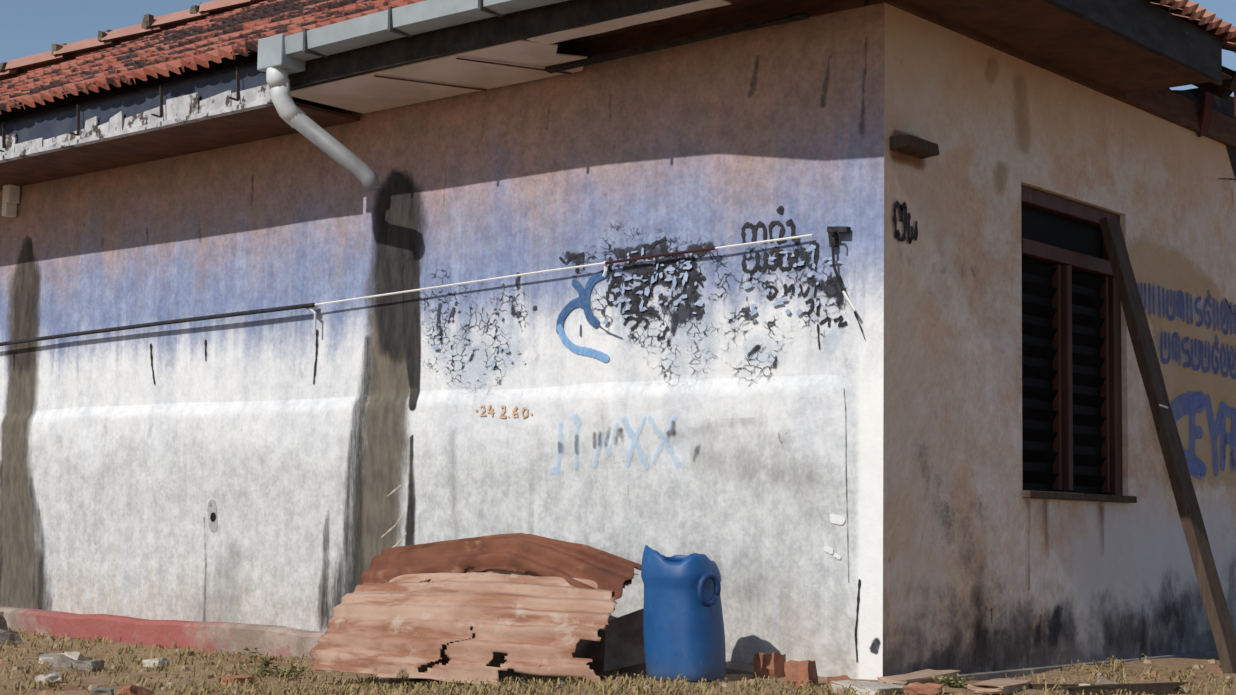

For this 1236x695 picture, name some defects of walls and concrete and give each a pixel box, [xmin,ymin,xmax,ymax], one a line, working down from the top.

crack [1219,145,1236,199]
peeling [562,225,847,386]
damp [0,237,44,610]
damp [321,171,423,628]
damp [975,583,1063,671]